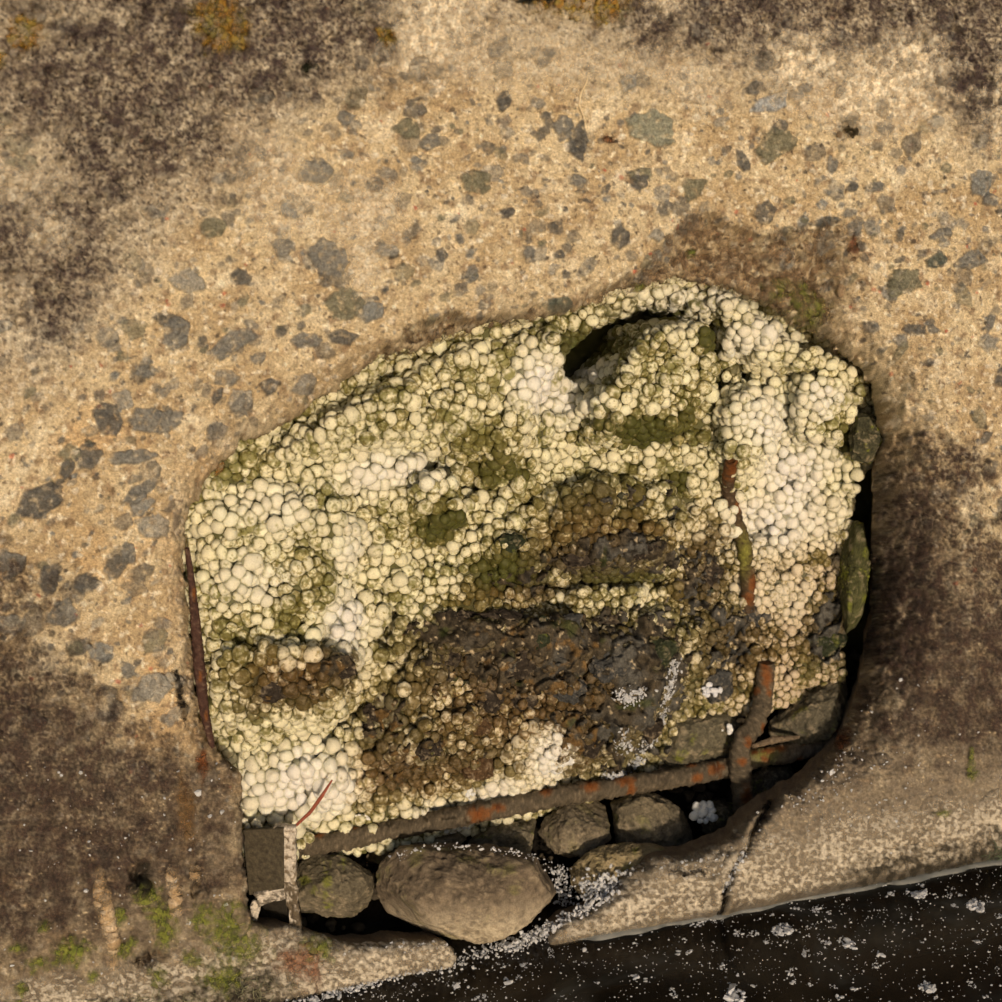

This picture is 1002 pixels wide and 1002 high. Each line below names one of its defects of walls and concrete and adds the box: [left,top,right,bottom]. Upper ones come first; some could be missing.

leakage [0,561,51,611]
corrosion [185,547,215,771]
leakage [864,433,1002,749]
leakage [0,627,235,947]
crack [670,799,771,915]